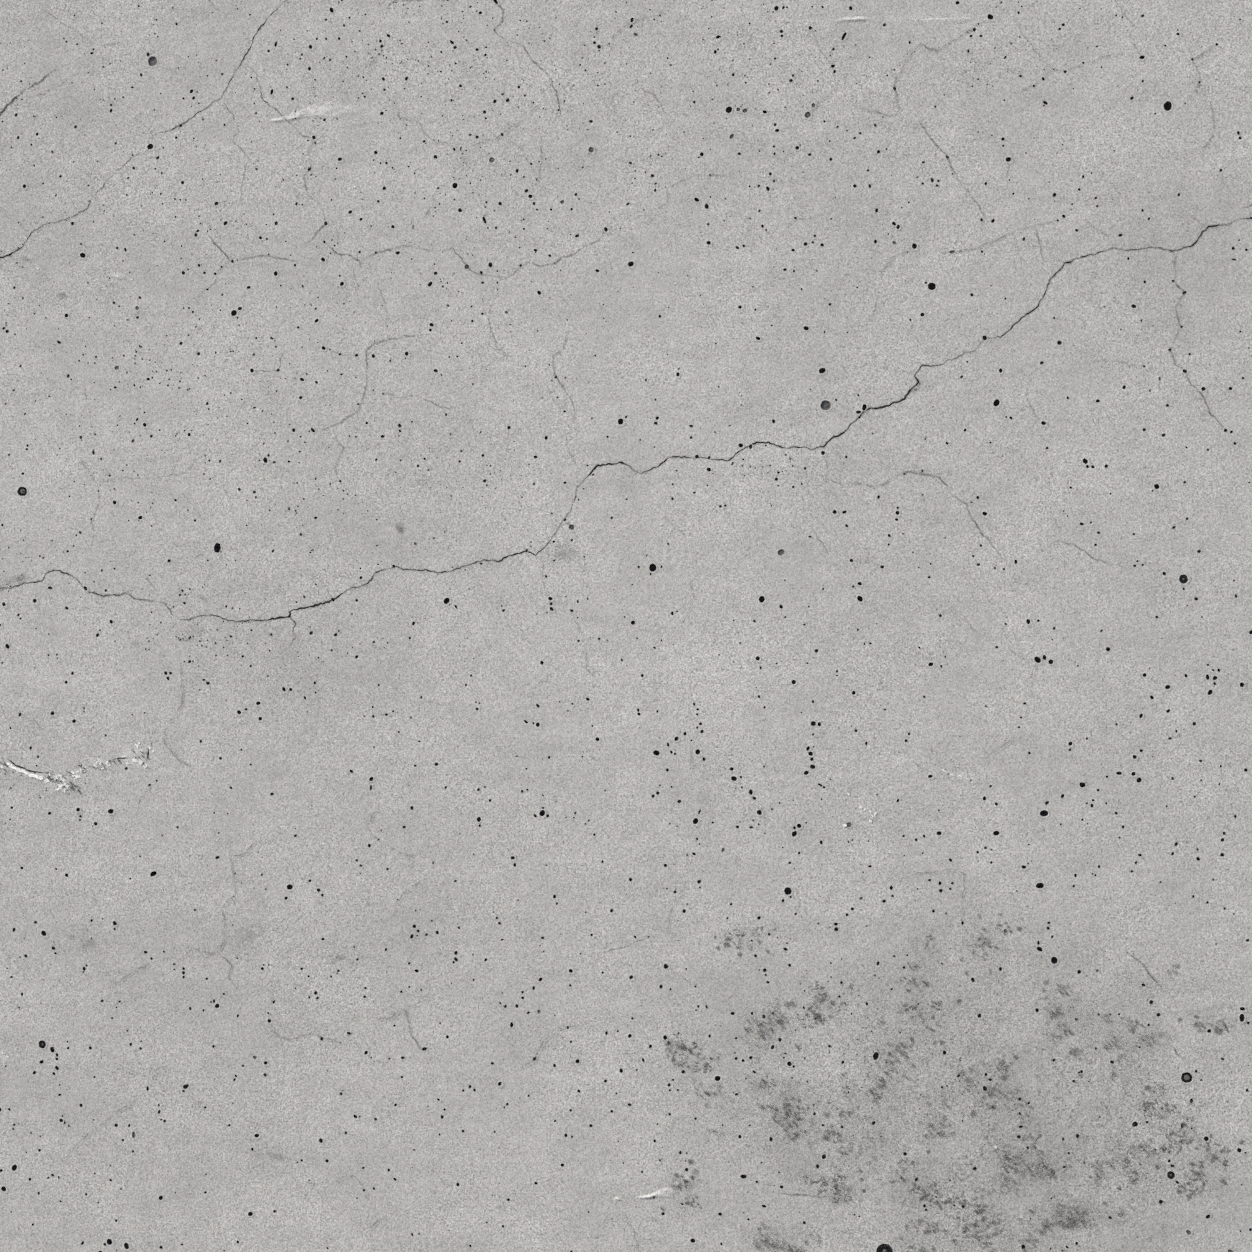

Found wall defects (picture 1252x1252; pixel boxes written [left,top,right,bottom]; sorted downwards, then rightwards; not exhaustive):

crack [0,7,279,258]
crack [0,204,1252,640]
damp [741,985,852,1038]
mould [900,1150,997,1252]
mould [1089,1119,1244,1200]